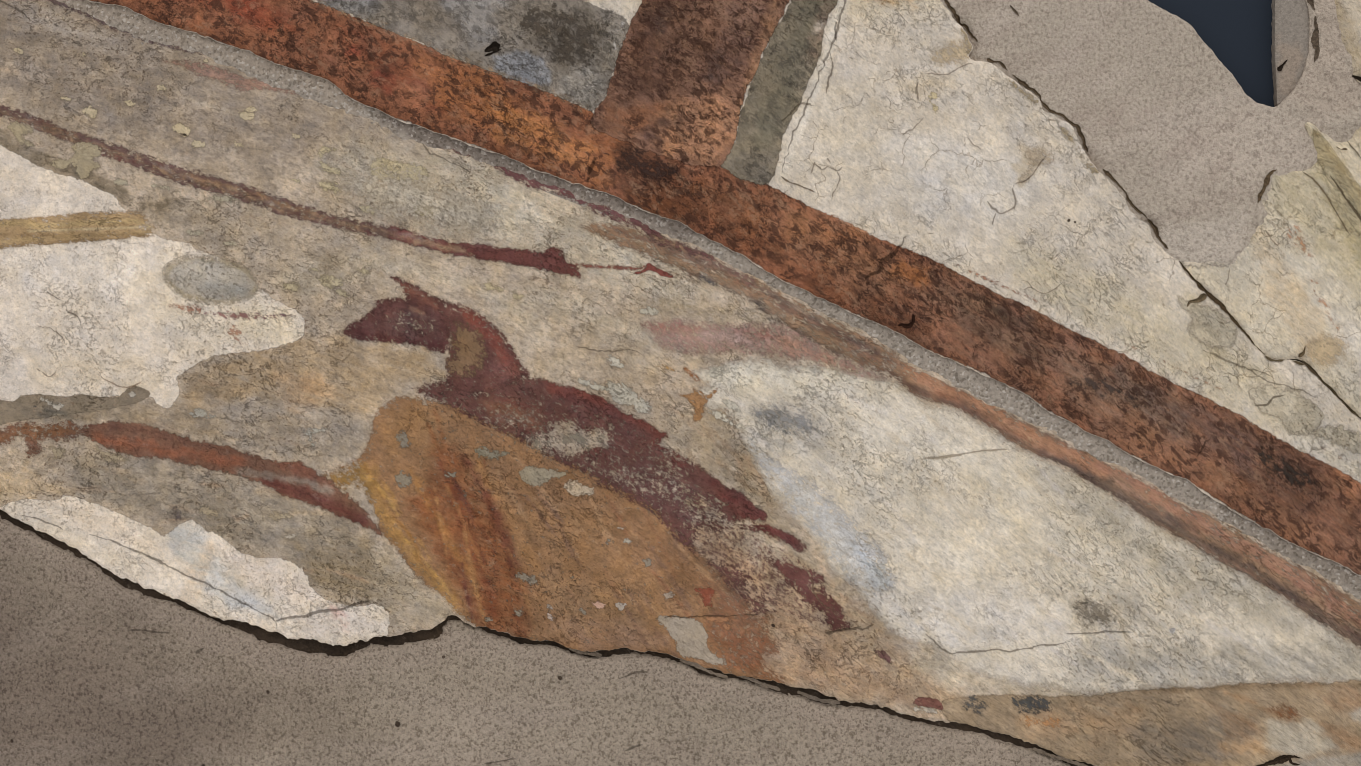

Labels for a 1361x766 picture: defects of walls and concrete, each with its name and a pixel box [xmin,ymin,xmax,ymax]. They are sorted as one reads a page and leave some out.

crack [944,0,1361,419]
crack [0,510,1094,766]
crack [1257,755,1300,766]